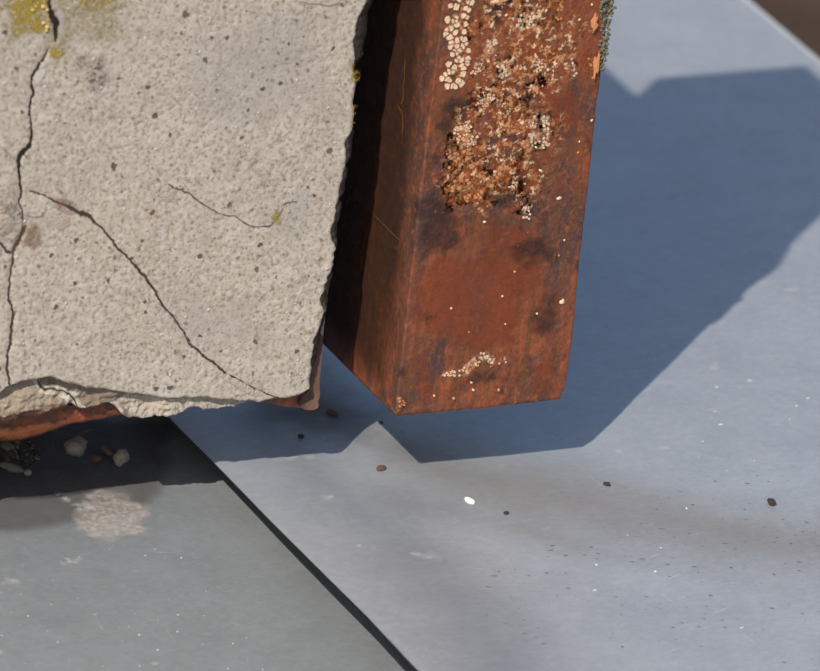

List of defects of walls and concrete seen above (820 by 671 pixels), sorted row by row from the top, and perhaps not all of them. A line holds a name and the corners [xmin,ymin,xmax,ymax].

corrosion [575,50,600,95]
corrosion [437,0,561,213]
crack [0,0,296,398]
crack [37,380,77,406]
corrosion [0,424,57,438]